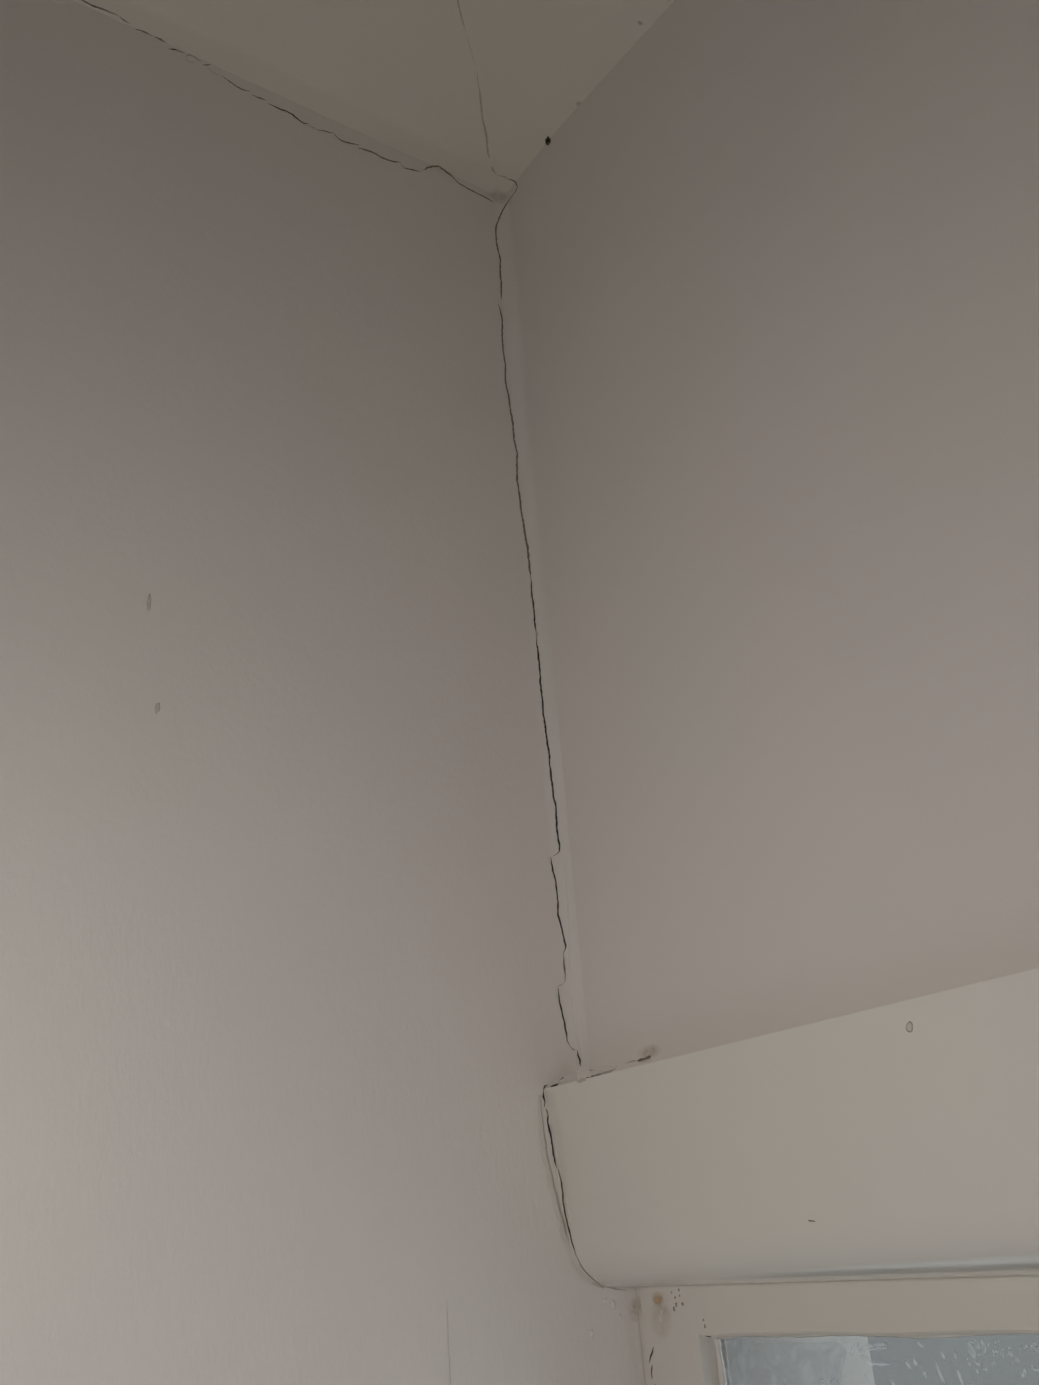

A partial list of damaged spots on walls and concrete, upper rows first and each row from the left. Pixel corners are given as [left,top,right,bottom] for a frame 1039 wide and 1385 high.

crack [55,0,637,1291]